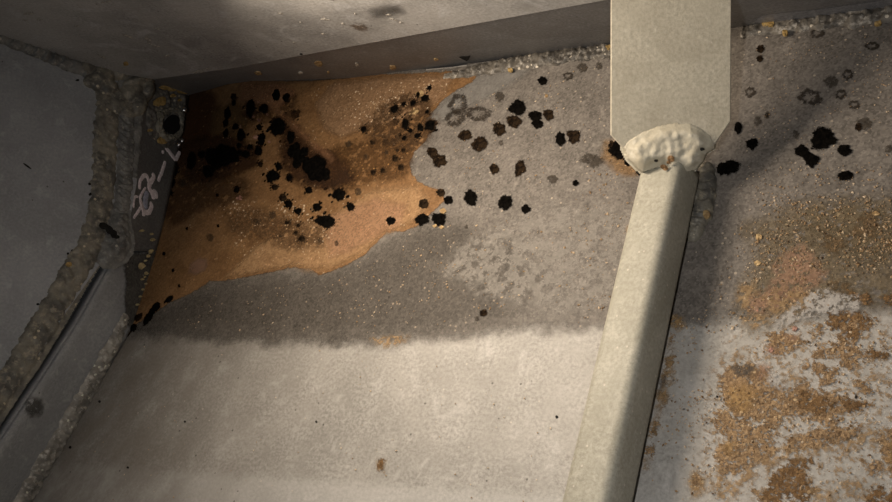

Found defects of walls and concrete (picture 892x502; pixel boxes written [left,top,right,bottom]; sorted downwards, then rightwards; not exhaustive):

leakage [128,51,641,346]
leakage [670,22,892,325]
rust [689,203,892,502]